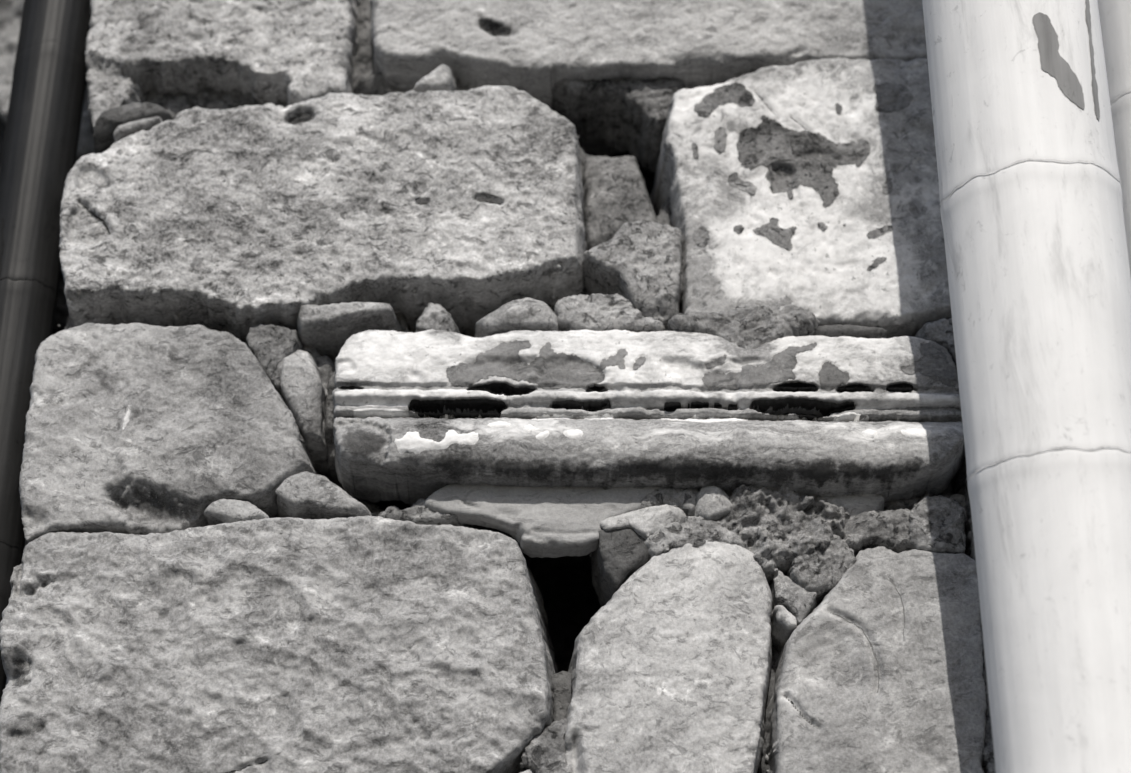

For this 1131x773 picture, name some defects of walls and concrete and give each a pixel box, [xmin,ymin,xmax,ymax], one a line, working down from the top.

peeling [1033,0,1100,120]
peeling [872,82,913,113]
peeling [694,82,870,208]
peeling [882,178,892,194]
peeling [692,226,710,247]
peeling [733,218,797,251]
peeling [866,225,893,239]
peeling [867,257,887,271]
peeling [887,341,958,393]
peeling [394,340,646,454]
peeling [661,342,877,438]
peeling [900,428,932,439]